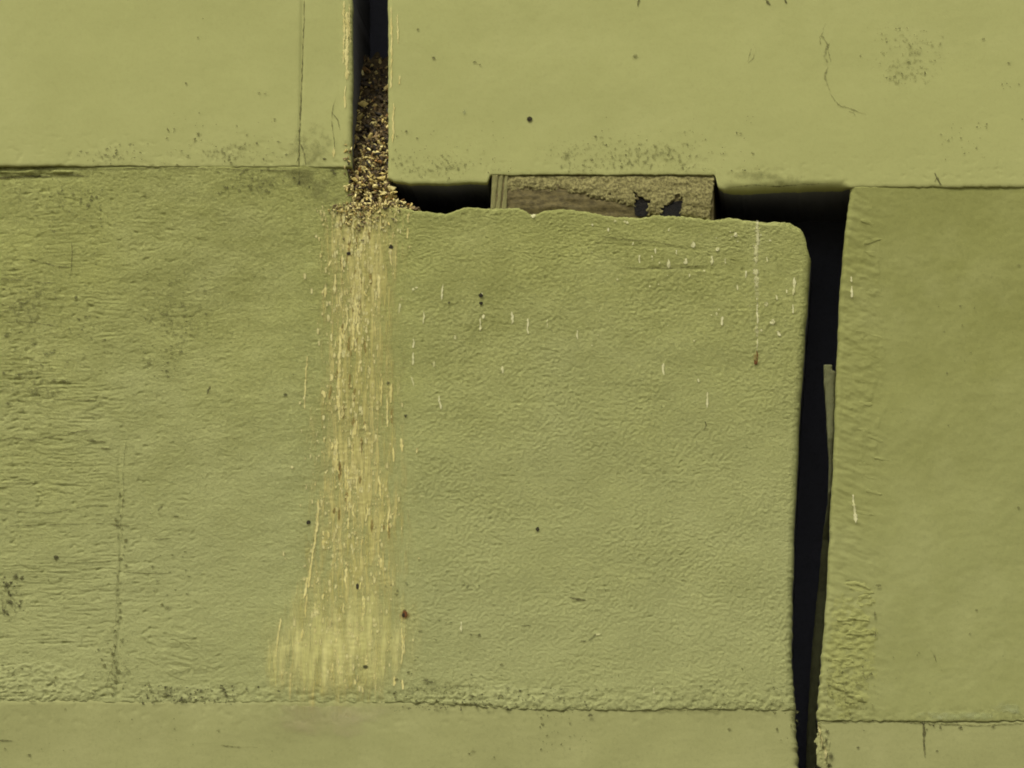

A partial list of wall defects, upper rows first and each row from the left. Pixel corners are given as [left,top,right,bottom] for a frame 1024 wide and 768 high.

spalling [634,192,683,217]
spalling [95,602,259,705]